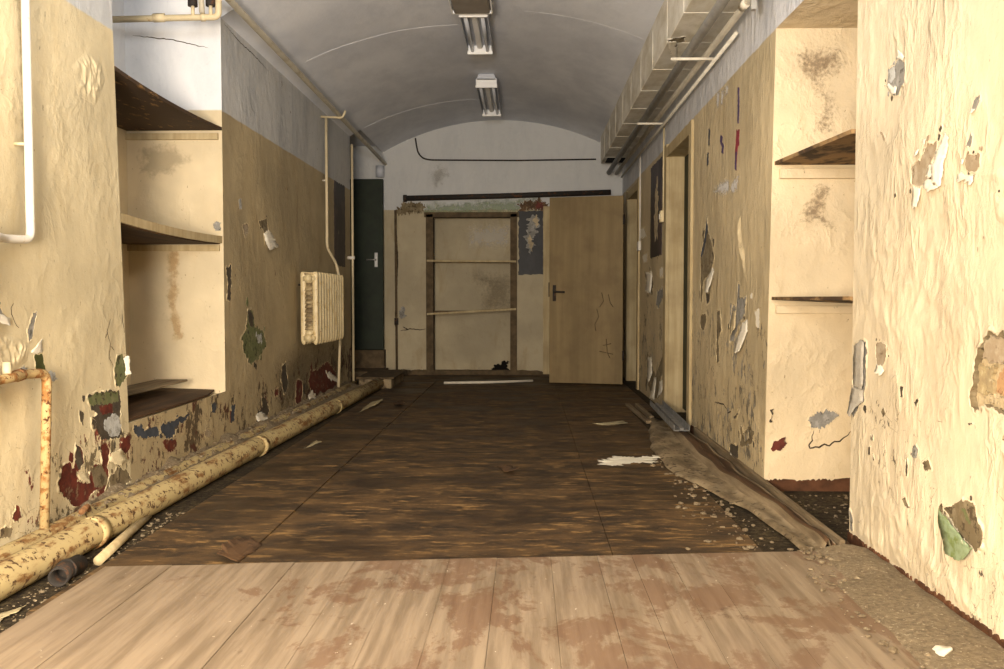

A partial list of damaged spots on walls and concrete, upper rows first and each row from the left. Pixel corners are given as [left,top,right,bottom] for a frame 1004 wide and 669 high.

peeling [884,50,907,101]
peeling [909,124,949,209]
peeling [956,130,983,185]
peeling [0,302,11,326]
peeling [18,309,58,383]
peeling [240,297,267,369]
peeling [699,213,760,364]
peeling [807,338,889,430]
spalling [967,325,1004,426]
peeling [56,353,190,509]
peeling [0,504,23,540]
peeling [938,495,984,561]